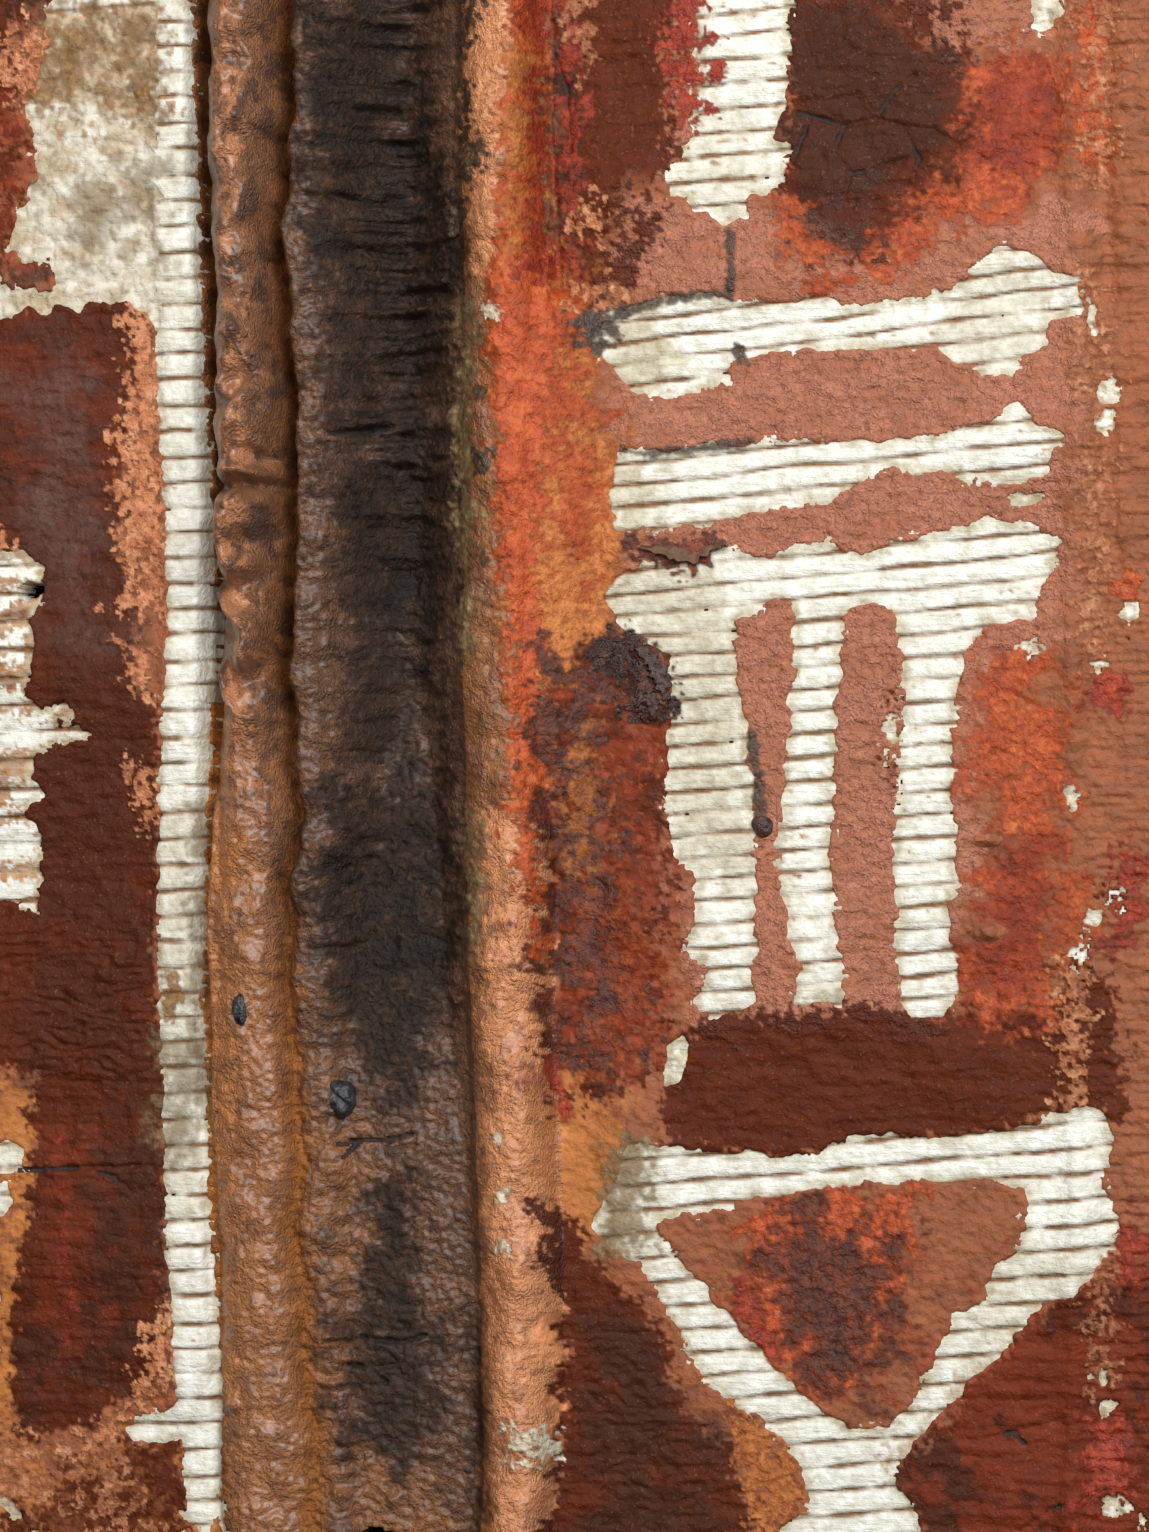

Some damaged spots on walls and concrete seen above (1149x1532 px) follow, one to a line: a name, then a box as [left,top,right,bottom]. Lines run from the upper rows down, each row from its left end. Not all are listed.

crack [794,85,900,177]
crack [913,147,922,167]
rust [767,0,1126,296]
peeling [1022,0,1138,202]
leakage [308,95,497,968]
rust [479,0,668,1124]
peeling [0,0,229,1532]
rust [951,647,1149,1043]
leakage [361,1167,421,1333]
rust [700,1181,933,1416]
peeling [592,886,1132,1532]
peeling [1101,1493,1147,1531]